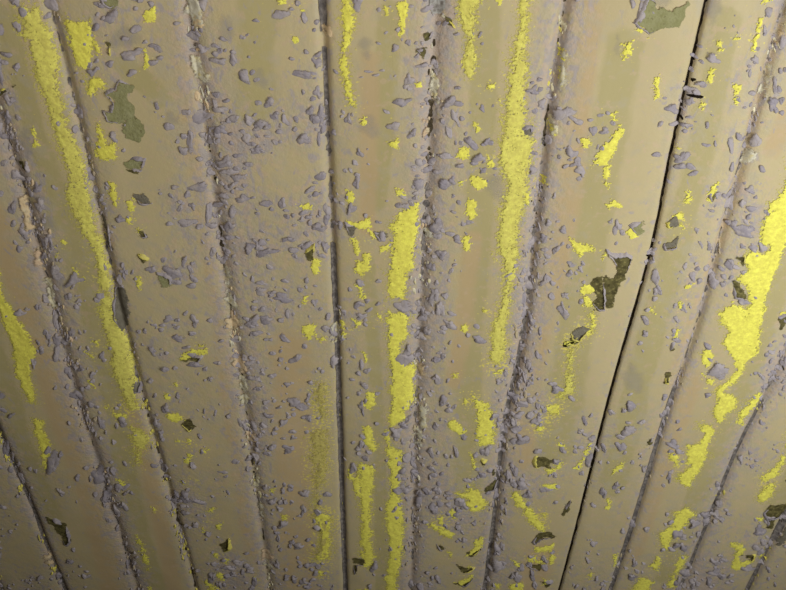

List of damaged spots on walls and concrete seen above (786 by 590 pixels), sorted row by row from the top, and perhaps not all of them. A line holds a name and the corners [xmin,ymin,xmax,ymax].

peeling [143,6,156,23]
peeling [619,26,650,61]
peeling [751,18,764,52]
peeling [592,111,625,190]
peeling [12,1,154,473]
peeling [662,190,694,251]
peeling [179,344,208,363]
peeling [668,168,786,491]
peeling [165,412,210,464]
peeling [753,434,786,529]
peeling [46,517,71,547]
peeling [629,504,700,590]